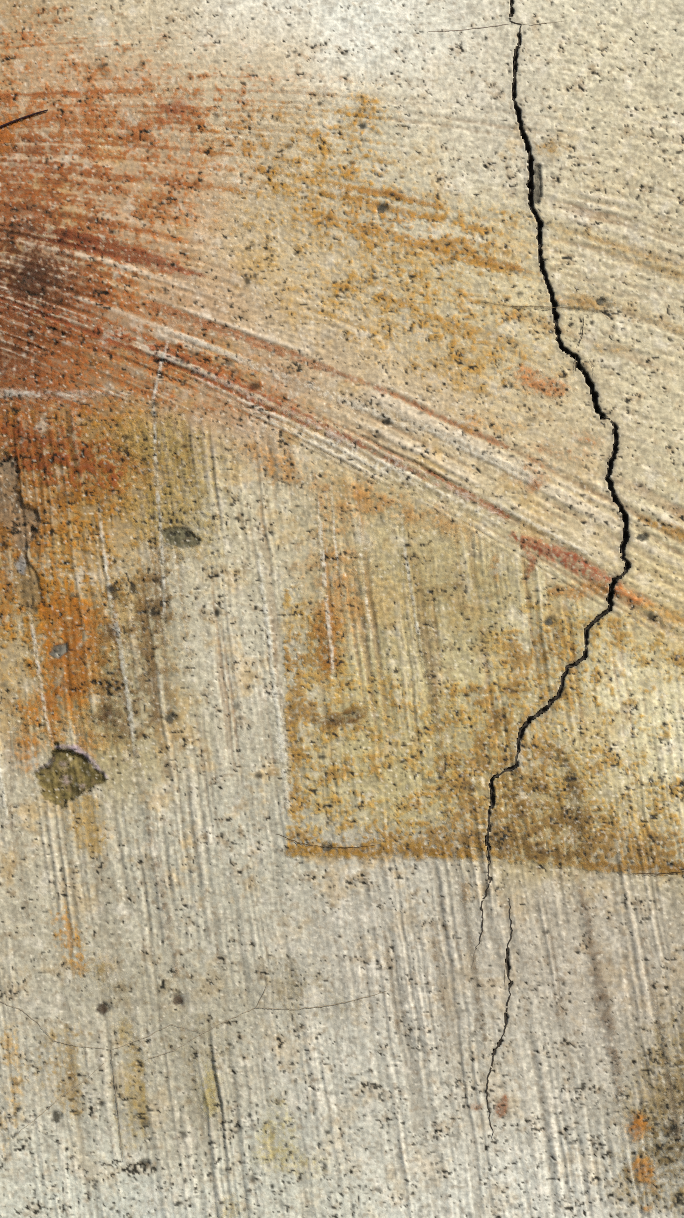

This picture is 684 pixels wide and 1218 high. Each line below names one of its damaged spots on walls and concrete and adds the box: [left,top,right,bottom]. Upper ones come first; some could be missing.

rust [0,7,381,771]
rust [521,368,565,395]
peeling [0,458,42,613]
crack [428,0,630,1140]
rust [514,534,653,606]
spalling [35,743,107,808]